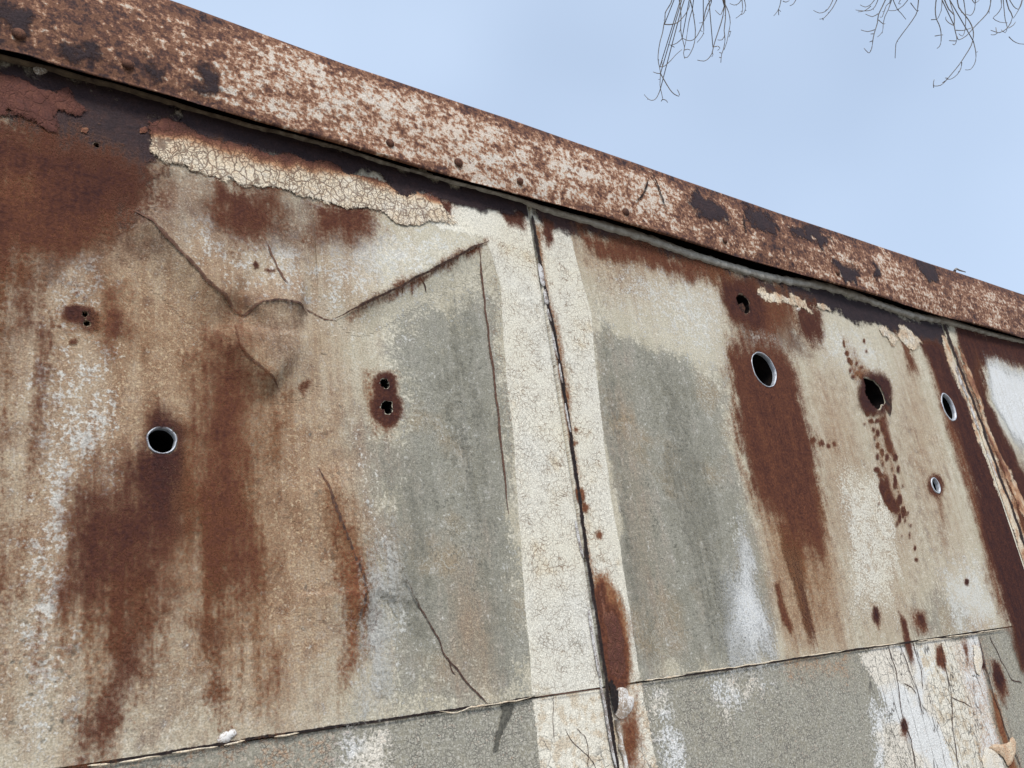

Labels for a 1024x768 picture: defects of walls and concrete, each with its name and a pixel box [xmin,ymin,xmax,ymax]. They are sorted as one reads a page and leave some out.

rust [55,293,310,768]
rust [302,200,376,244]
crack [68,210,619,768]
rust [364,371,403,432]
peeling [0,61,1024,562]
rust [711,270,836,645]
rust [843,339,918,562]
rust [919,327,1024,672]
crack [944,324,1024,545]
rust [589,551,643,768]
peeling [973,645,983,675]
peeling [982,737,1016,768]